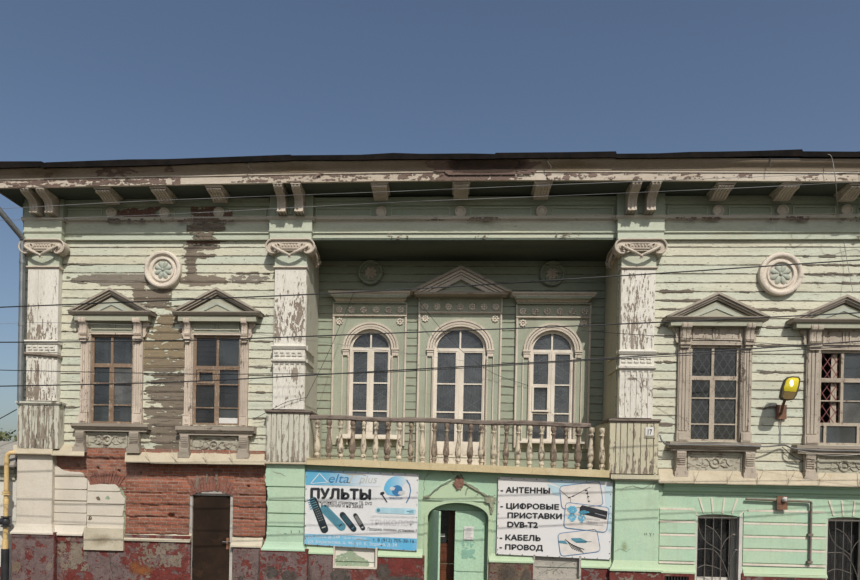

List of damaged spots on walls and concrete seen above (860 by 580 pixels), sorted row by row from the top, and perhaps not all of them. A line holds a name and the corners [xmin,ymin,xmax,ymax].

peeling [231,159,642,182]
peeling [107,207,162,223]
peeling [178,206,270,287]
peeling [804,254,860,285]
peeling [621,273,701,349]
spalling [12,263,422,580]
peeling [619,373,673,438]
peeling [609,438,658,474]
flaking render [488,562,531,580]
peeling [583,568,660,580]